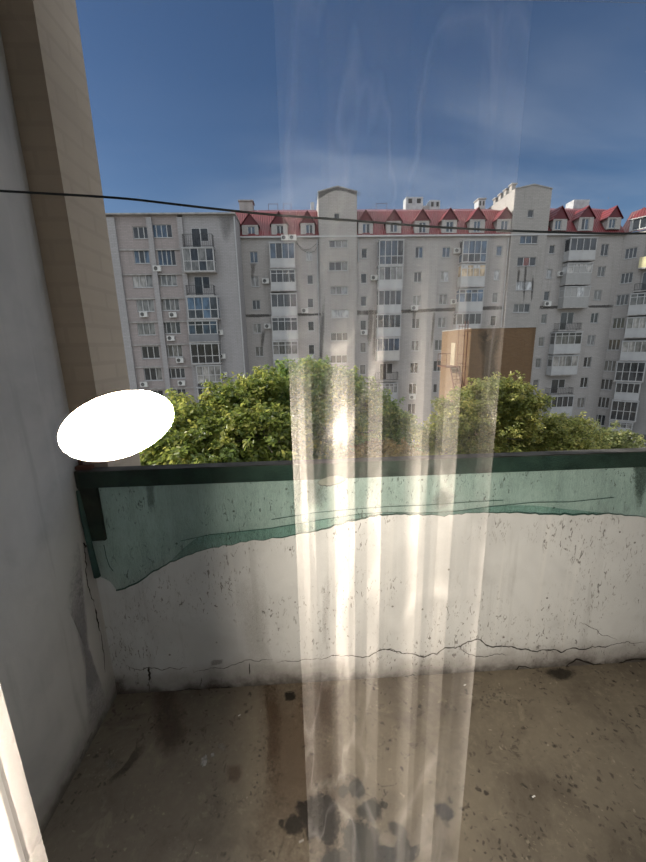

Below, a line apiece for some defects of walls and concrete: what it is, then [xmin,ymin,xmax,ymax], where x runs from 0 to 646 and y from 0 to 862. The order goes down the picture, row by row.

damp [634,467,646,499]
crack [83,543,105,669]
crack [128,622,646,691]